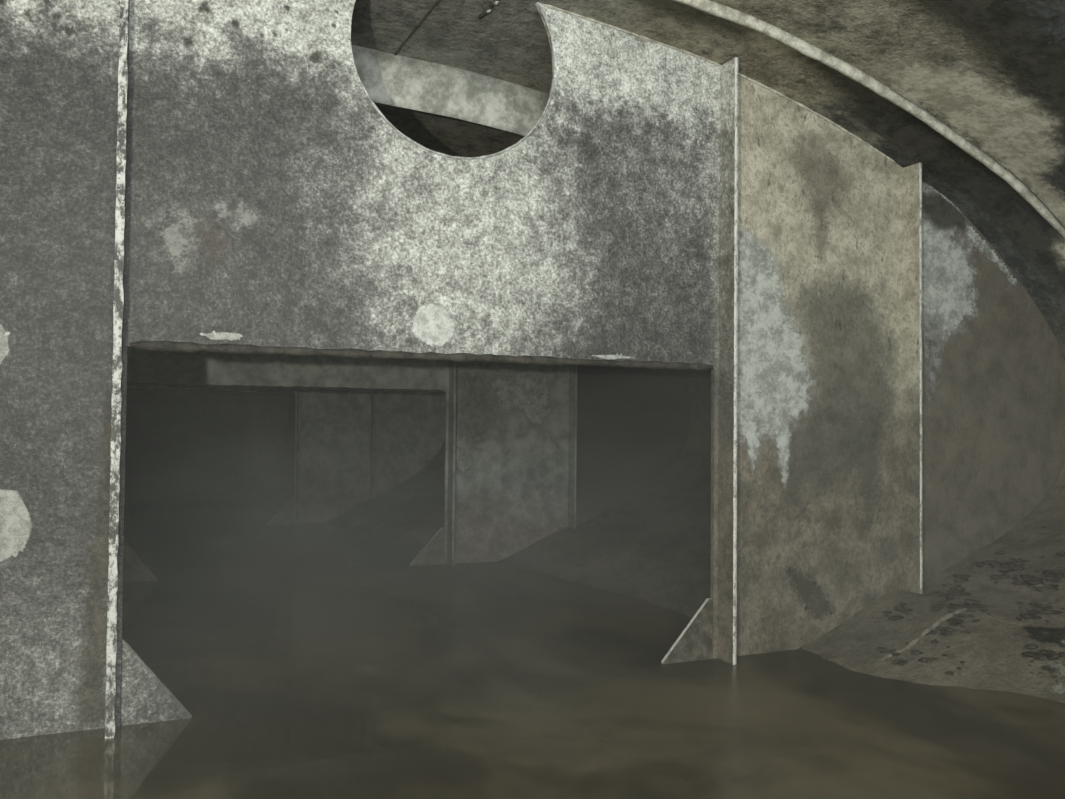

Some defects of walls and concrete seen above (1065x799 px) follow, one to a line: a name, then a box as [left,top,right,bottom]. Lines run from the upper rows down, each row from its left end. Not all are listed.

damp [641,0,742,35]
damp [813,0,1065,277]
damp [737,232,888,497]
damp [922,187,1017,398]
damp [1023,626,1065,647]